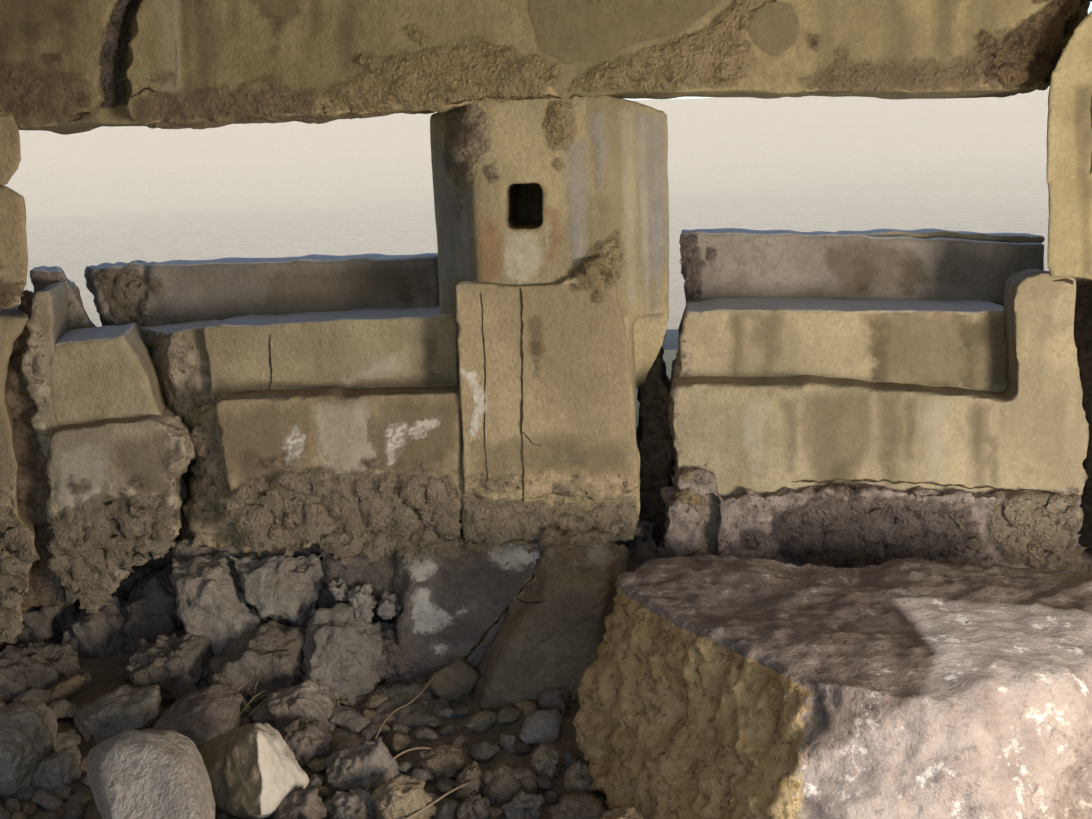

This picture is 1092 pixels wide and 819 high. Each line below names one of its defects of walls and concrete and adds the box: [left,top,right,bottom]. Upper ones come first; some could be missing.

crack [68,0,164,122]
crack [749,0,780,16]
spalling [810,0,1087,93]
leakage [386,419,437,465]
crack [520,289,543,507]
crack [636,334,674,528]
crack [793,278,1092,550]
spalling [0,475,180,645]
spalling [214,457,645,566]
spalling [740,482,1087,570]